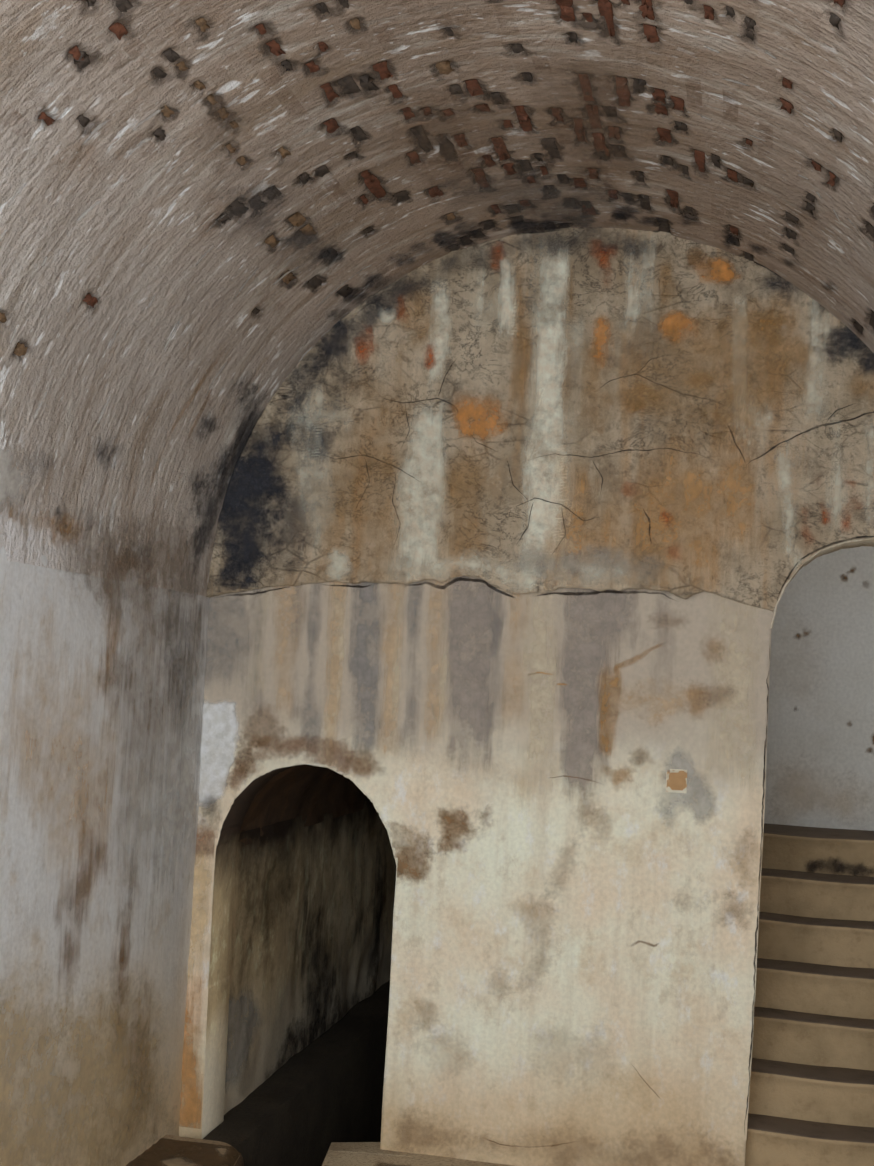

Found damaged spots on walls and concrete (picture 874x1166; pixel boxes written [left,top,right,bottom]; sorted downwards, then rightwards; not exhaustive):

spalling [554,0,662,46]
spalling [684,0,756,42]
spalling [151,48,239,129]
spalling [205,22,874,611]
corrosion [456,401,502,440]
crack [386,357,697,553]
crack [702,398,874,463]
damp [87,265,416,773]
damp [259,412,499,771]
crack [409,578,668,597]
damp [396,811,469,879]
damp [0,1002,241,1166]